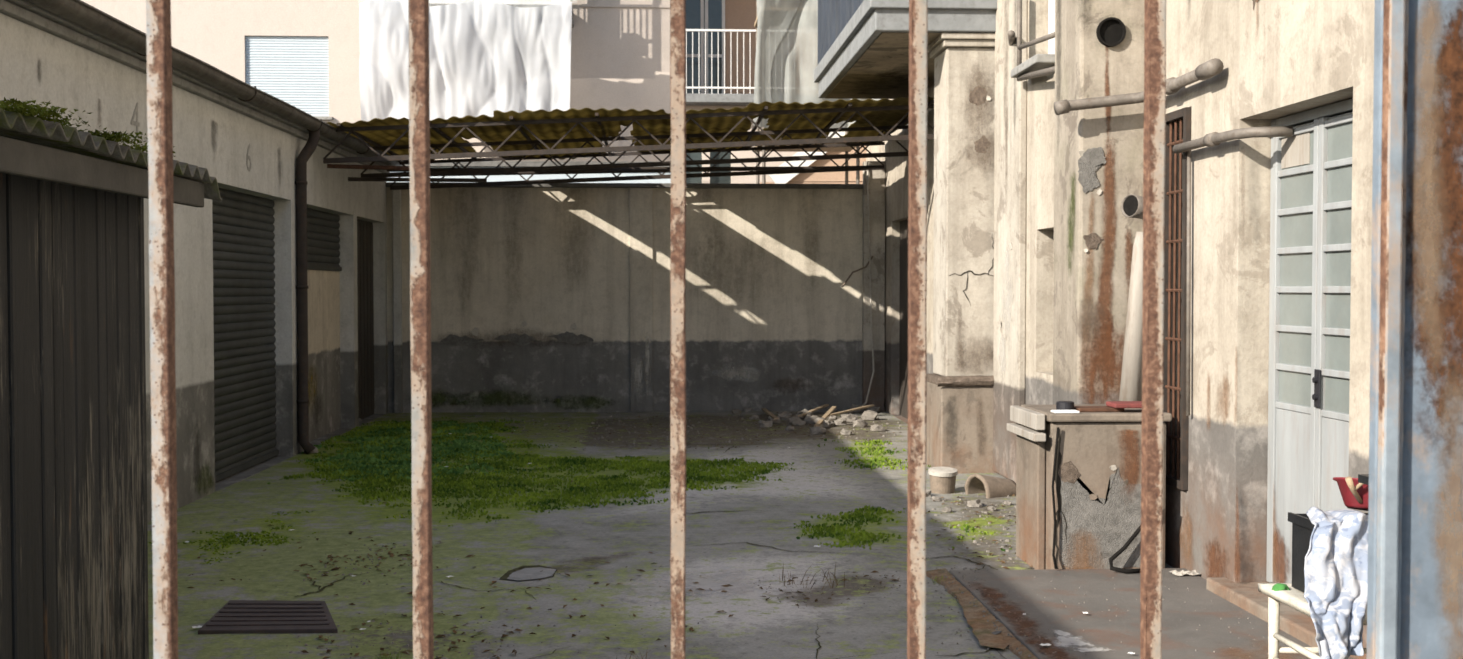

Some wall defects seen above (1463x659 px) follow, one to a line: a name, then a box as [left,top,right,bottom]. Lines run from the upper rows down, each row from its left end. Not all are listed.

spalling [1078,147,1106,195]
corrosion [1081,46,1132,404]
corrosion [1406,1,1463,659]
flaking render [1059,461,1141,569]